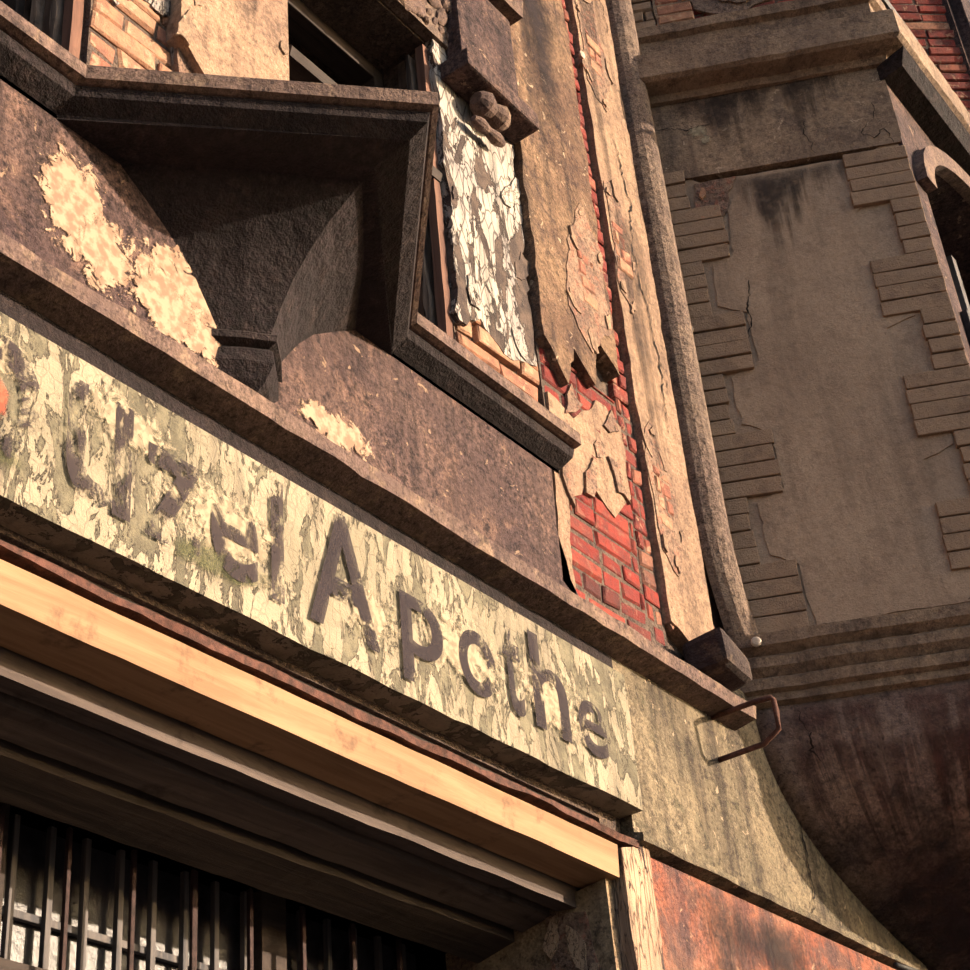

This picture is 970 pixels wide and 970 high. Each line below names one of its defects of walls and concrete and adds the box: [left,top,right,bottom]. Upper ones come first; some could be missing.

spalling [631,0,709,29]
peeling [33,137,222,368]
spalling [453,0,685,652]
peeling [298,398,375,461]
spalling [682,625,752,692]
spalling [542,911,602,970]